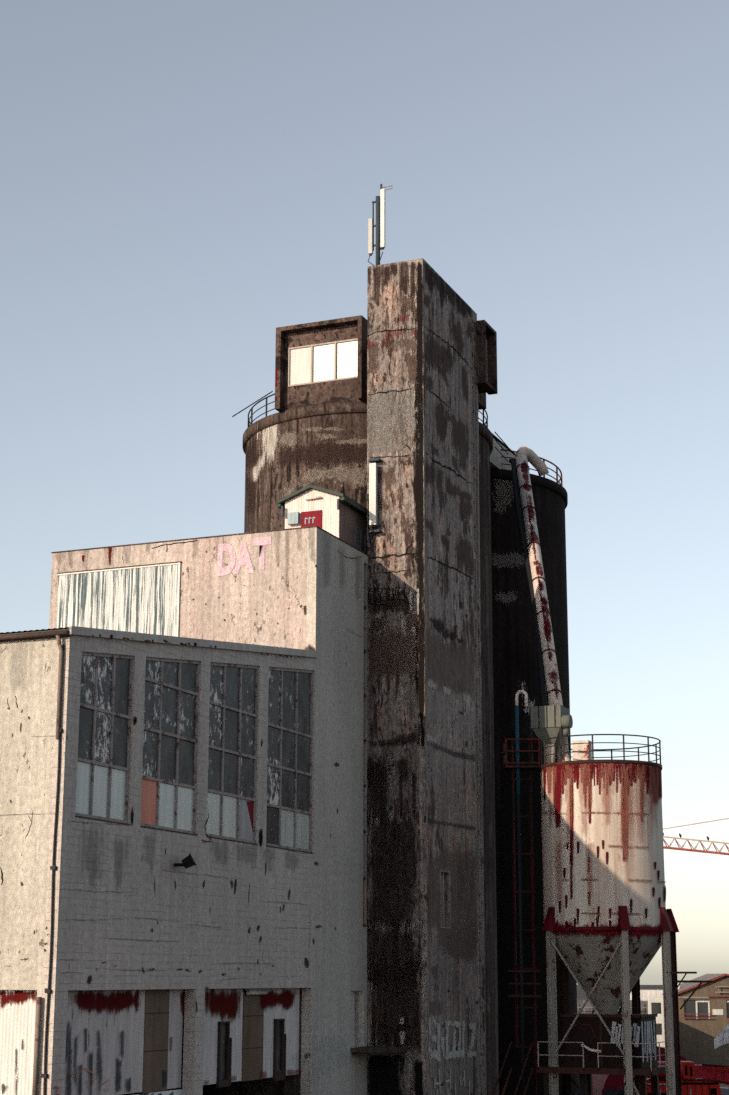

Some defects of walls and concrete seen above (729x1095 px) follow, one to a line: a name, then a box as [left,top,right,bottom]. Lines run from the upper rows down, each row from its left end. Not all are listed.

water stain [246,424,366,523]
rust [521,460,559,698]
water stain [367,261,478,1095]
rust [543,763,666,936]
water stain [497,730,562,1095]
rust [0,990,37,1008]
rust [71,990,139,1015]
rust [205,989,240,1024]
rust [259,989,302,1010]